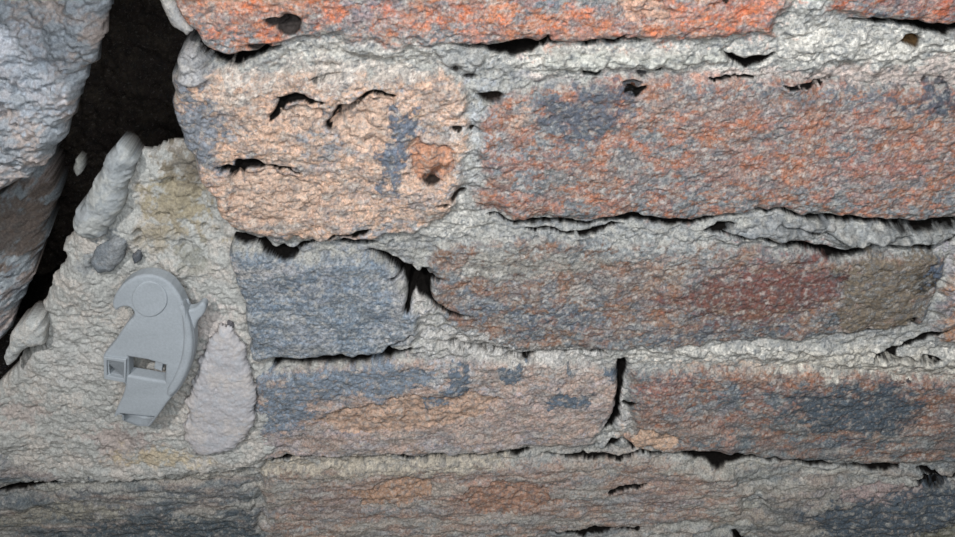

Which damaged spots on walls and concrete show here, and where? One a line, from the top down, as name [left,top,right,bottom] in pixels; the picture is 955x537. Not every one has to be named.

crack [270,74,395,129]
crack [489,207,955,257]
crack [234,229,536,366]
crack [400,348,955,489]
crack [608,483,647,495]
crack [556,525,640,537]